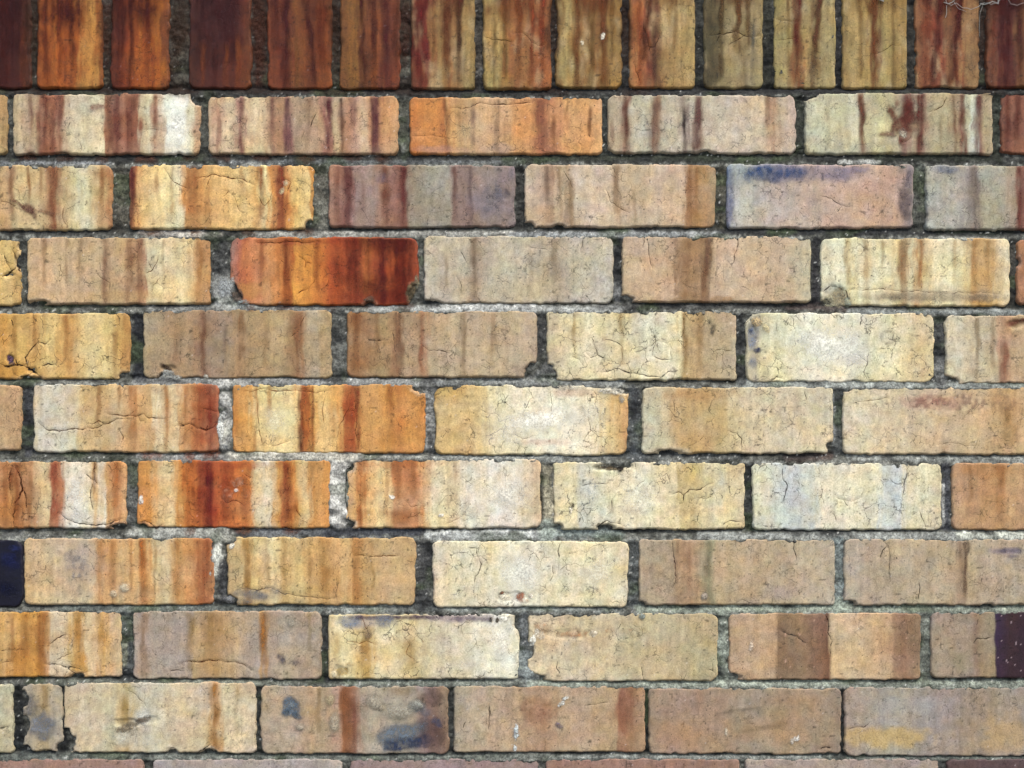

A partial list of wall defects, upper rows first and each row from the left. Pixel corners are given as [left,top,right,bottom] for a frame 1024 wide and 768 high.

rust [27,0,80,69]
rust [360,0,396,69]
rust [880,95,923,146]
rust [348,239,411,299]
crack [2,320,53,377]
crack [590,318,685,377]
crack [8,470,27,517]
crack [62,462,159,529]
rust [197,452,230,506]
crack [585,473,703,525]